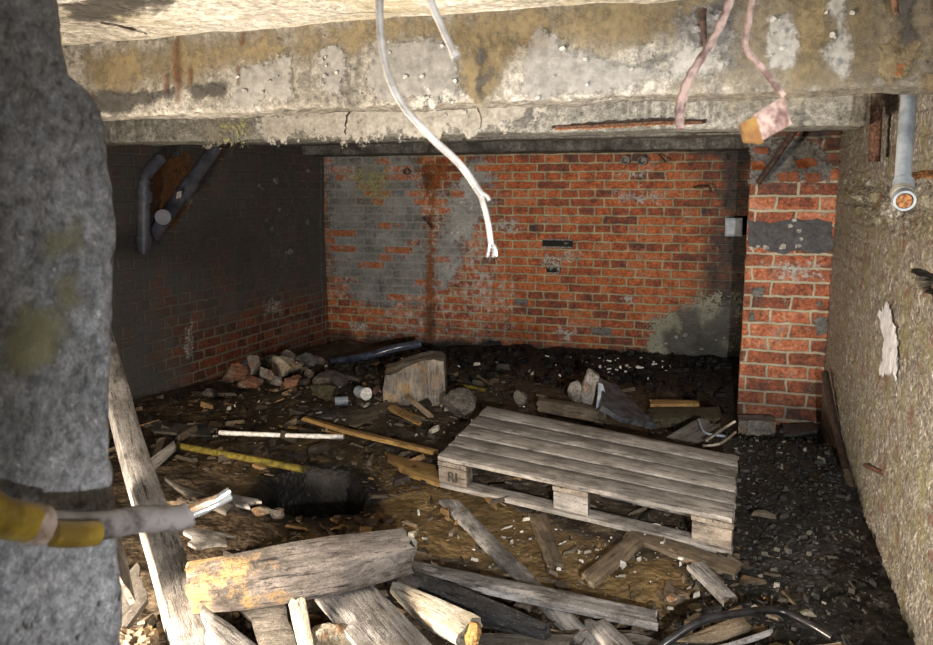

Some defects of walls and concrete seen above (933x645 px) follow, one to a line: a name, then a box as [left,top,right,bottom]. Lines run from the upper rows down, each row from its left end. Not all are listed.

water stain [58,0,180,26]
water stain [87,0,712,117]
water stain [726,0,933,99]
rust [418,158,453,341]
water stain [664,301,737,358]
spalling [910,269,933,296]